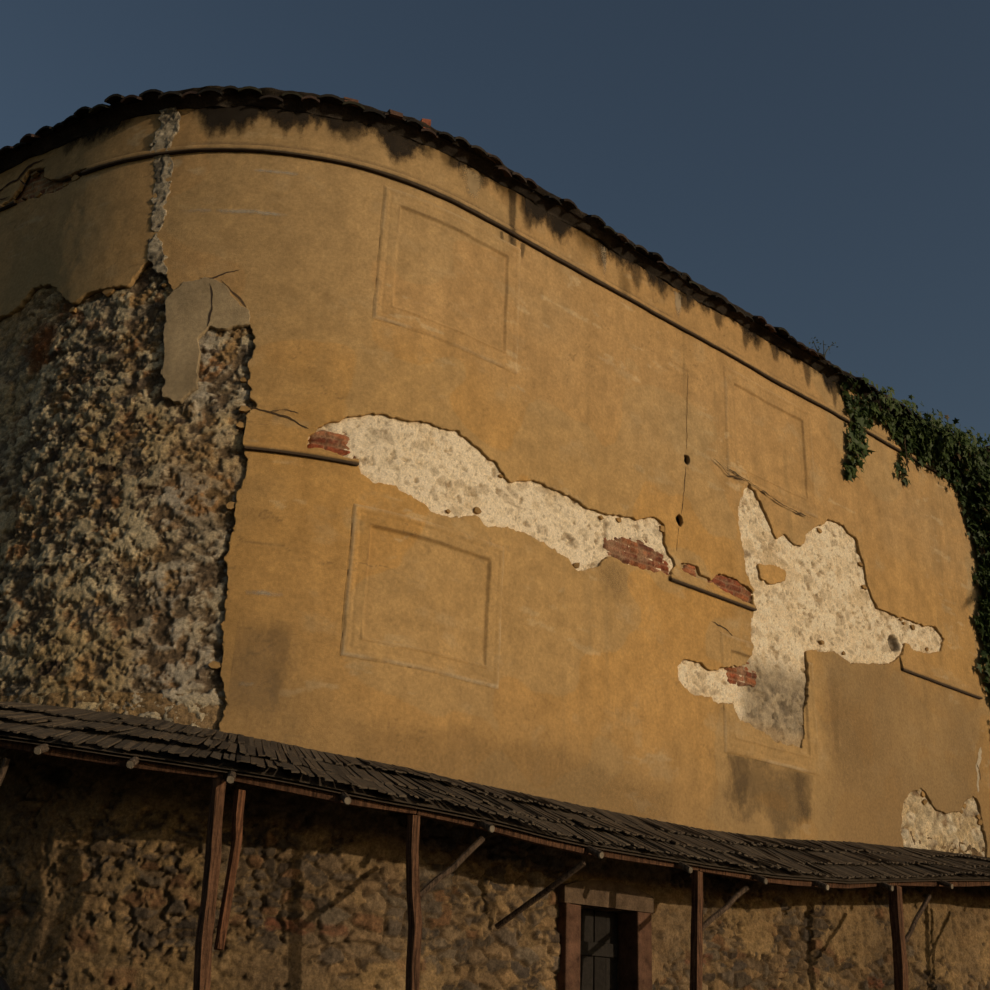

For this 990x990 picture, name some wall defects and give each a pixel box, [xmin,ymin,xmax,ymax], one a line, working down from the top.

damp [194,106,425,160]
crack [0,159,44,200]
damp [525,198,573,239]
damp [602,244,710,313]
spalling [0,264,256,732]
spalling [307,414,942,747]
spalling [901,789,985,857]